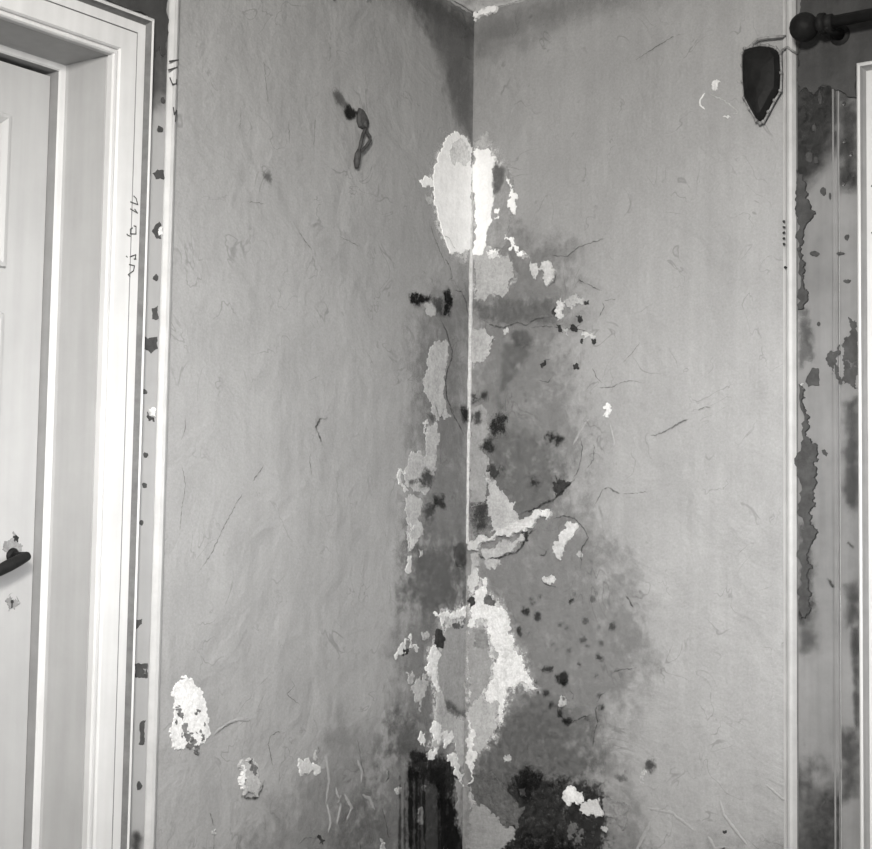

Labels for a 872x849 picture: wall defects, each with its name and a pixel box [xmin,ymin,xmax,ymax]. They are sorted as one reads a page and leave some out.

damp [839,93,857,187]
flaking render [419,131,555,301]
damp [410,289,453,317]
peeling [396,339,451,574]
peeling [794,317,858,619]
damp [845,403,857,504]
flaking render [394,404,580,849]
flaking render [169,675,211,756]
damp [398,750,463,849]
damp [502,767,607,849]
flaking render [562,785,630,833]
damp [799,734,856,849]